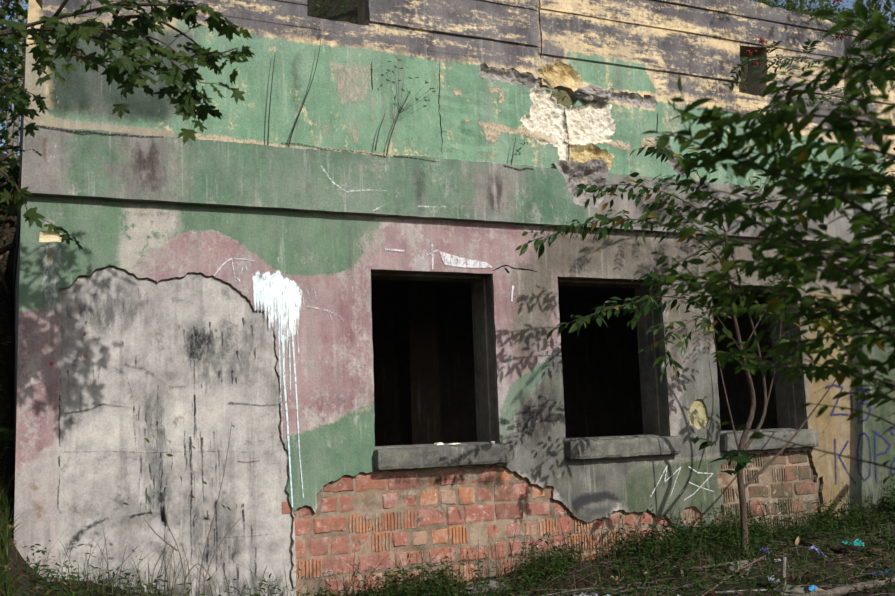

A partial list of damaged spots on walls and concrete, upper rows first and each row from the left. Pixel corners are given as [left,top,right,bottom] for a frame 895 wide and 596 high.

spalling [464,59,686,208]
leakage [184,322,223,386]
leakage [181,395,213,526]
spalling [55,265,701,596]
spalling [713,450,823,534]